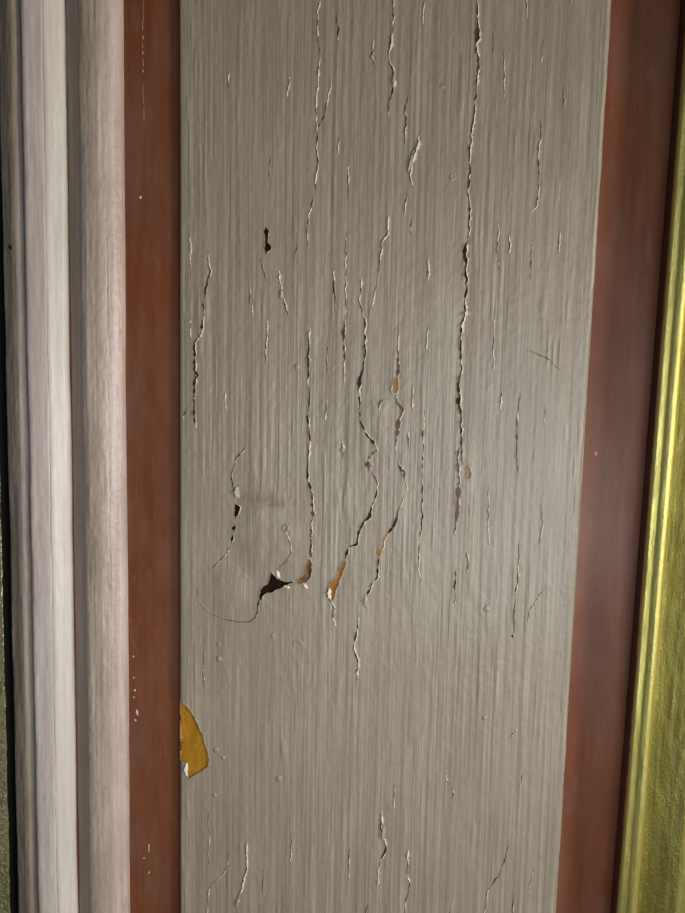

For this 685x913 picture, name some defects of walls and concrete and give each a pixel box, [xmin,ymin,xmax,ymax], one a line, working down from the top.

crack [530,120,542,214]
crack [181,236,212,430]
crack [248,0,427,684]
crack [452,0,506,607]
crack [491,308,522,473]
crack [494,221,534,281]
peeling [276,556,314,588]
peeling [324,558,348,603]
crack [511,506,544,639]
peeling [180,699,211,781]
crack [206,814,265,913]
crack [364,783,411,913]